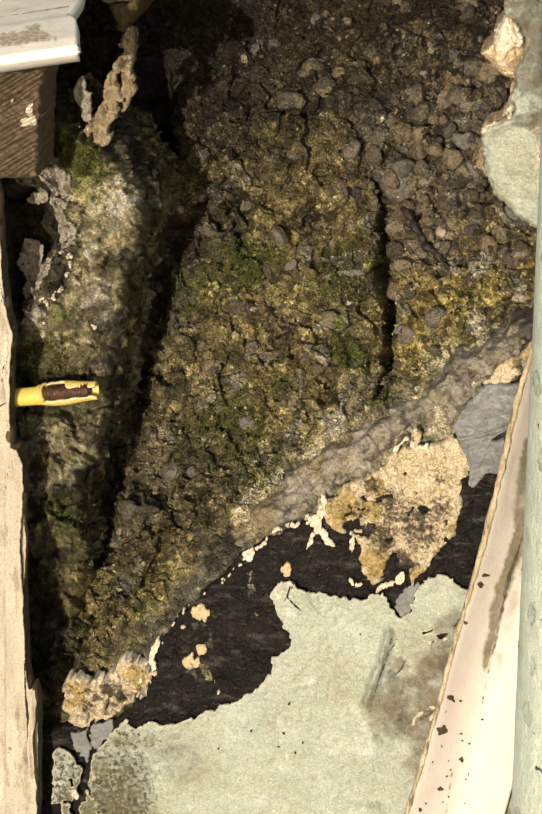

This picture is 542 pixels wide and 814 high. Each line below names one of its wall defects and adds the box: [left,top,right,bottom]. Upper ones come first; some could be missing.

spalling [56,0,125,122]
peeling [83,24,139,147]
peeling [472,137,487,177]
peeling [480,99,515,135]
peeling [510,18,524,49]
peeling [17,157,78,332]
crack [355,194,405,400]
peeling [41,340,532,814]
leakage [483,438,528,672]
leakage [372,656,448,771]